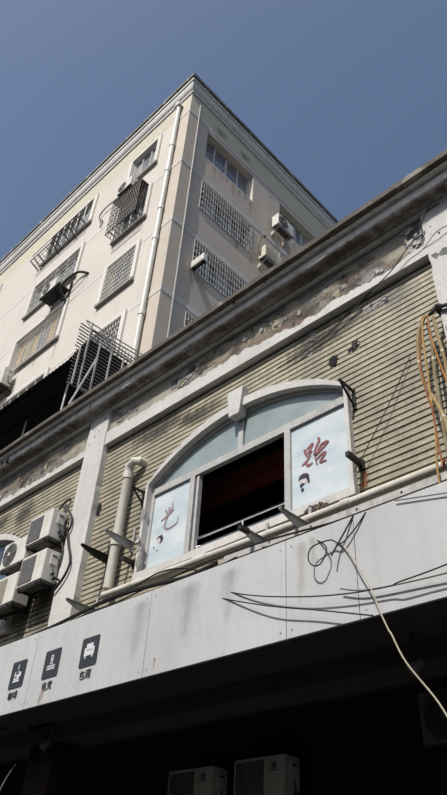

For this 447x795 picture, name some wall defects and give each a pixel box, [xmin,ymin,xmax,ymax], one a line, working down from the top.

peeling [169,224,440,390]
peeling [115,402,139,423]